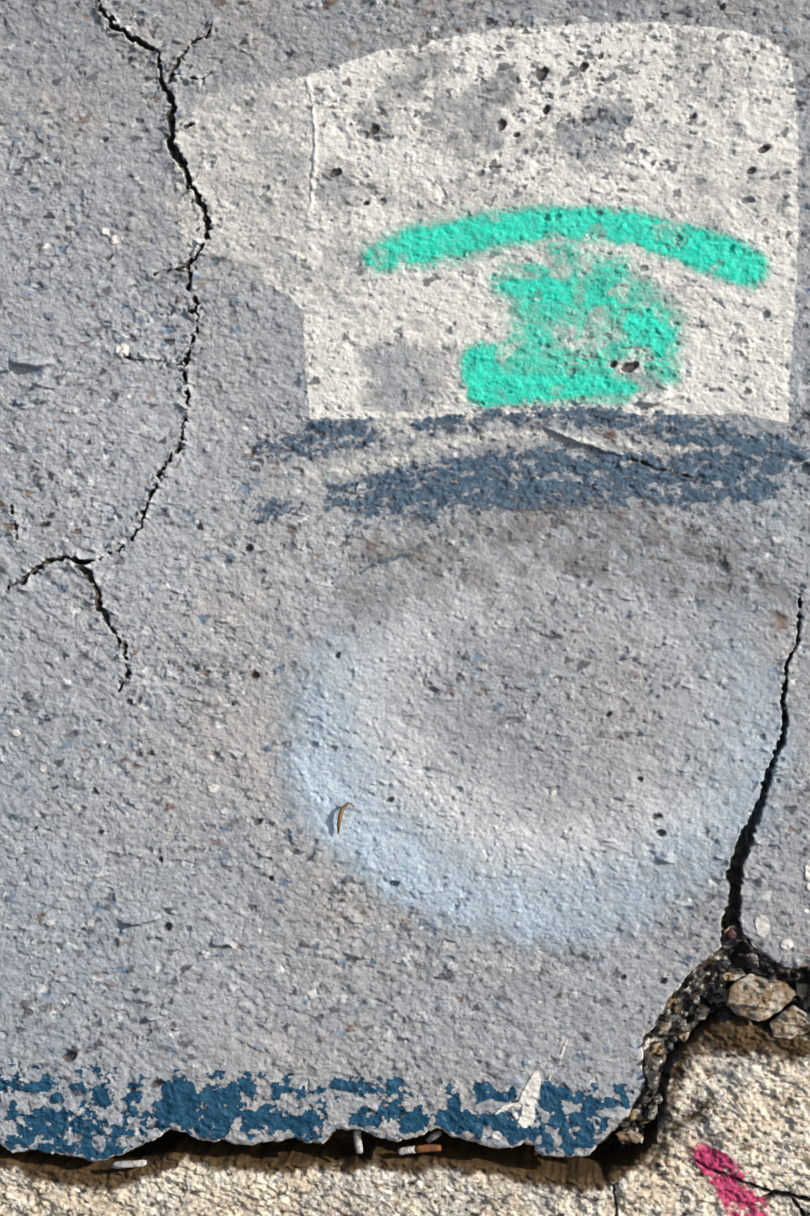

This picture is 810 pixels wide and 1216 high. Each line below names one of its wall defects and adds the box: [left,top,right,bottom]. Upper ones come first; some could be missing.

crack [7,0,212,692]
crack [720,597,802,945]
peeling [0,923,810,1162]
crack [714,1169,810,1216]